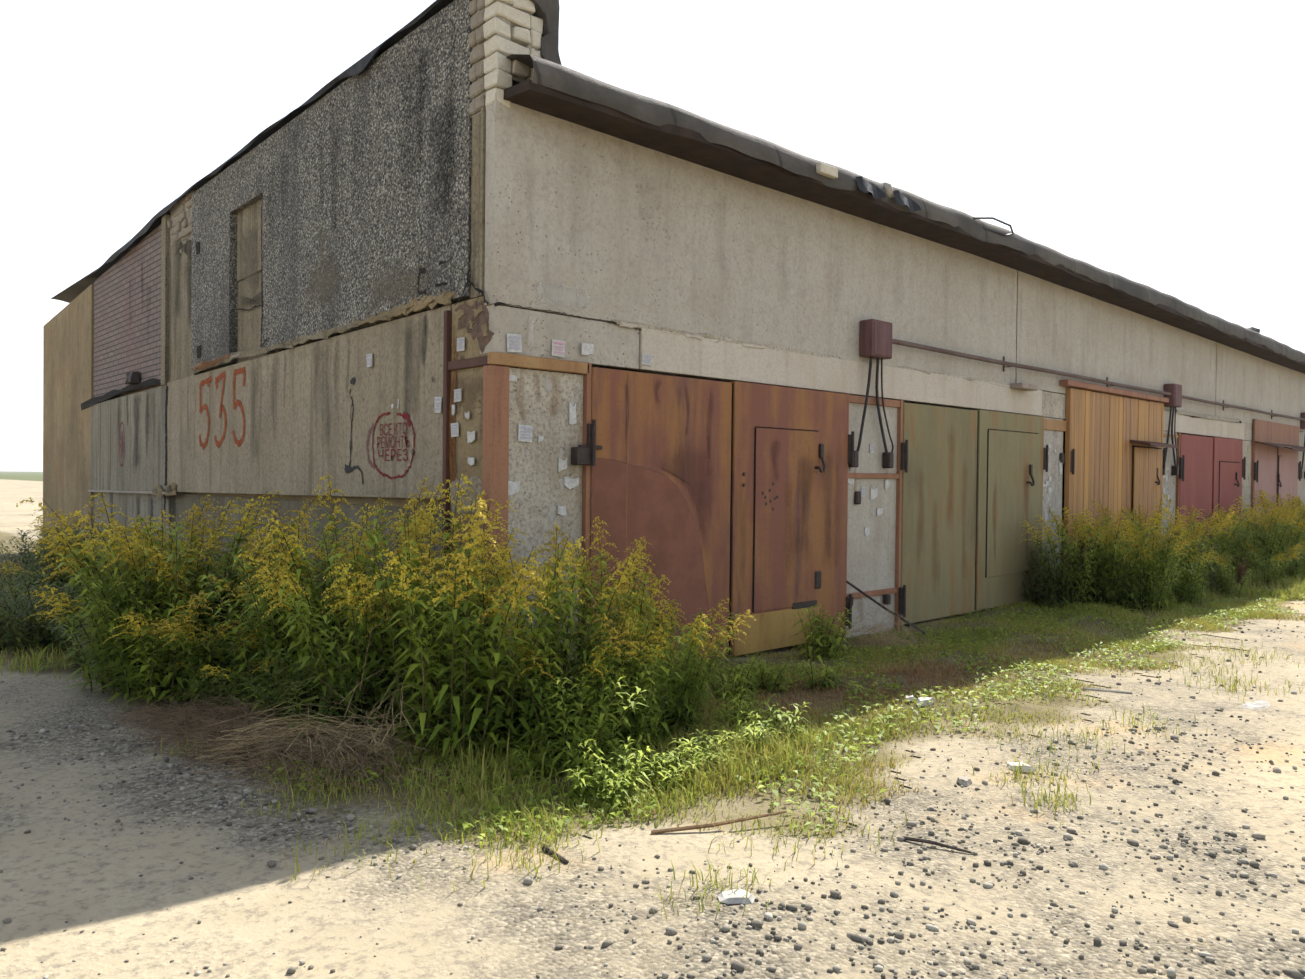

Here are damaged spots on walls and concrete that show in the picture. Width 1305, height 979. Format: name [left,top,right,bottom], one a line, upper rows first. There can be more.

corrosion [590,458,712,651]